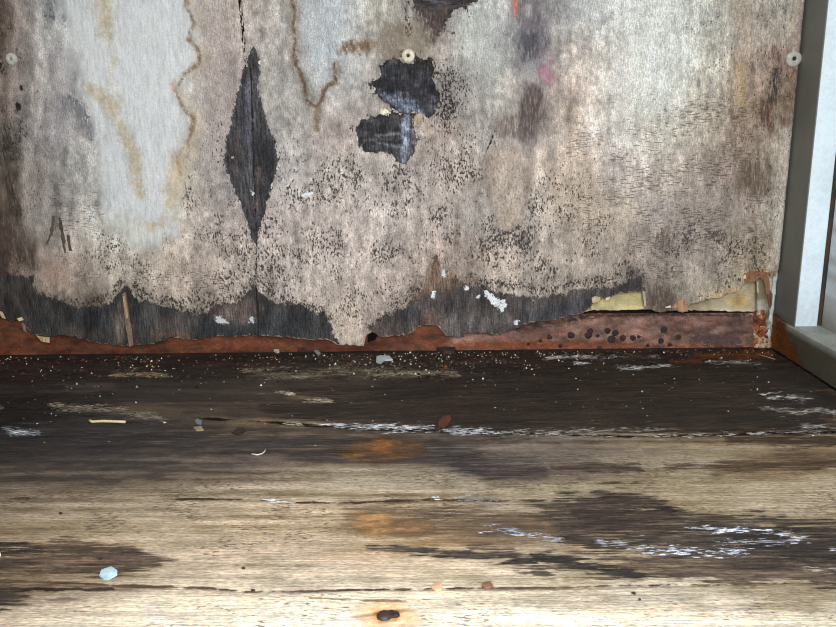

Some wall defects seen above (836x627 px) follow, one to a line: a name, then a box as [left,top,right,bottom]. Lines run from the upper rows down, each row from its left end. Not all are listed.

peeling [403,0,478,44]
damp [44,0,209,248]
peeling [349,51,460,173]
peeling [223,43,279,274]
peeling [17,317,50,343]
corrosion [180,338,297,353]
damp [0,123,836,590]
corrosion [451,310,802,366]
peeling [665,300,688,312]
damp [0,536,179,611]
corrosion [358,603,413,627]